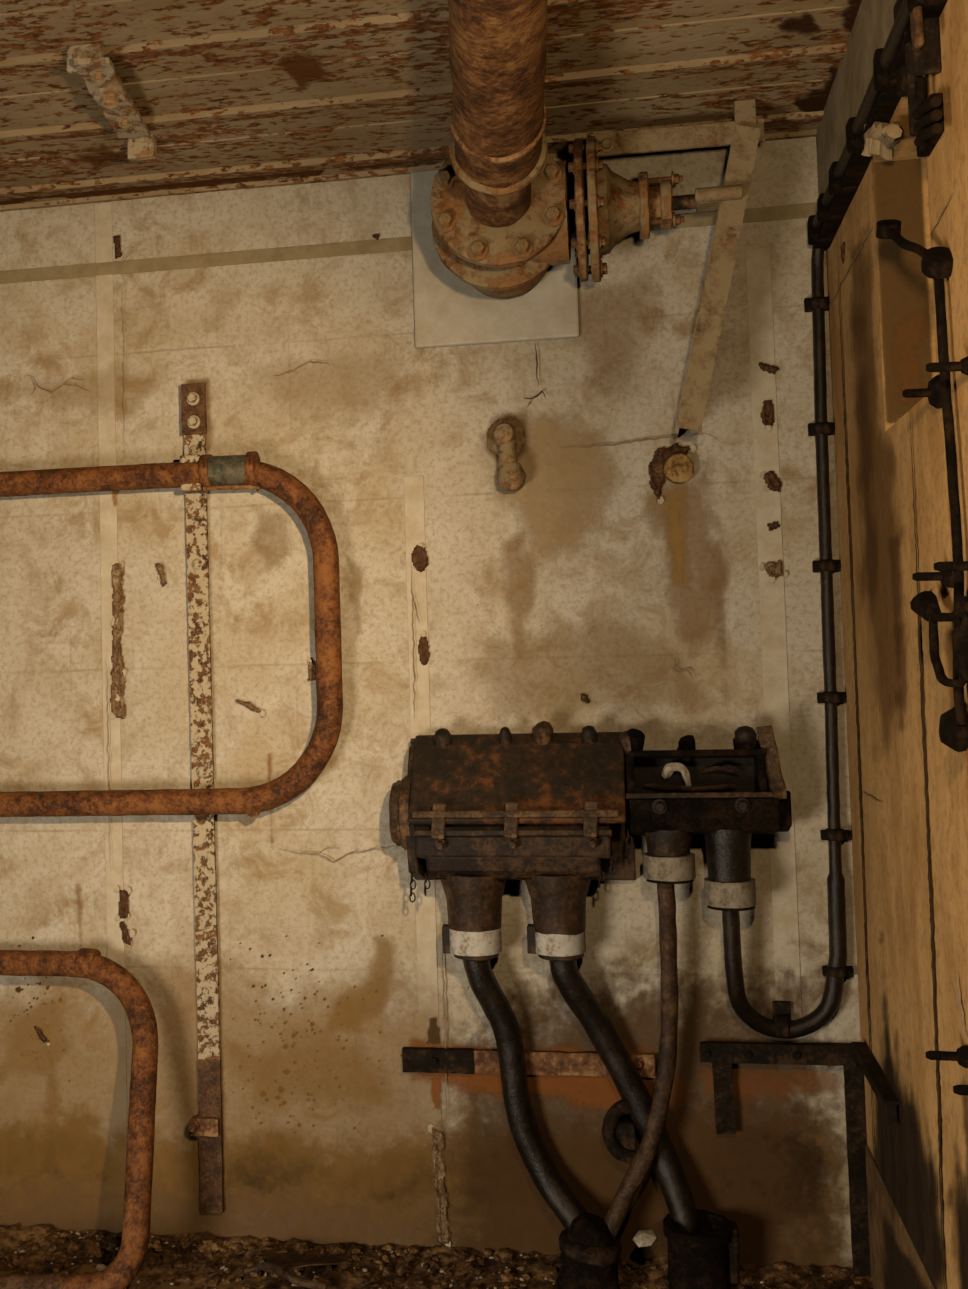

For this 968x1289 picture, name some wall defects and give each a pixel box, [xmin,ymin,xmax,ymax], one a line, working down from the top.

corrosion [779,15,819,33]
corrosion [793,68,838,112]
crack [29,375,90,393]
leakage [513,426,605,543]
crack [271,846,401,862]
corrosion [412,1018,443,1048]
leakage [150,935,559,1255]
corrosion [418,1073,503,1109]
corrosion [527,1075,622,1109]
leakage [873,1000,968,1289]
leakage [0,1114,127,1233]
leakage [759,1105,853,1269]